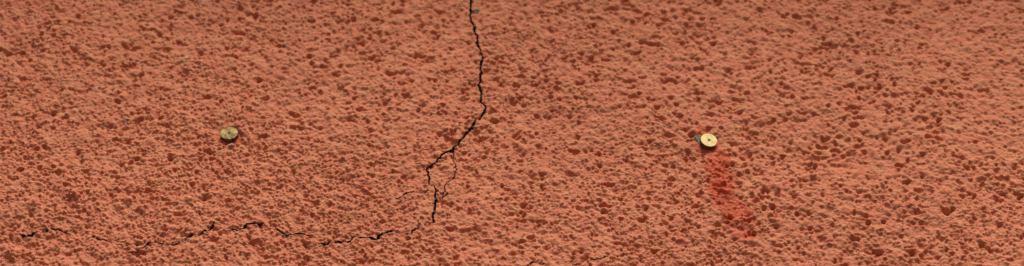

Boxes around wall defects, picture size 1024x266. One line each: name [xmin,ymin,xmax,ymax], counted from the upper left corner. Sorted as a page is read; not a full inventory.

crack [2,0,487,253]
rust [695,126,755,244]